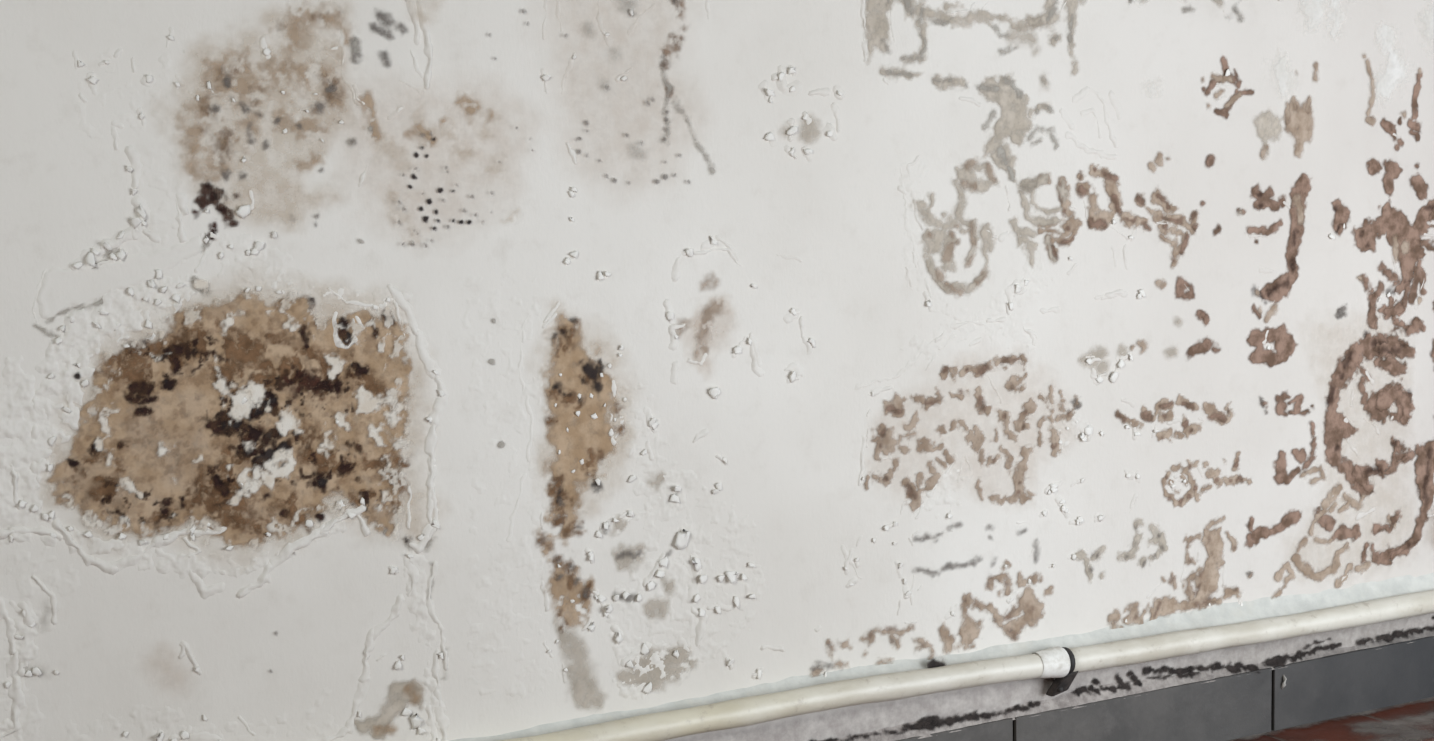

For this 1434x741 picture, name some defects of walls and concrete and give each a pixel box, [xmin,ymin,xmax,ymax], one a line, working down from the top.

flaking render [30,27,450,741]
leakage [175,12,405,192]
leakage [398,119,477,247]
leakage [647,37,690,141]
peeling [812,0,1233,677]
flaking render [1108,55,1434,629]